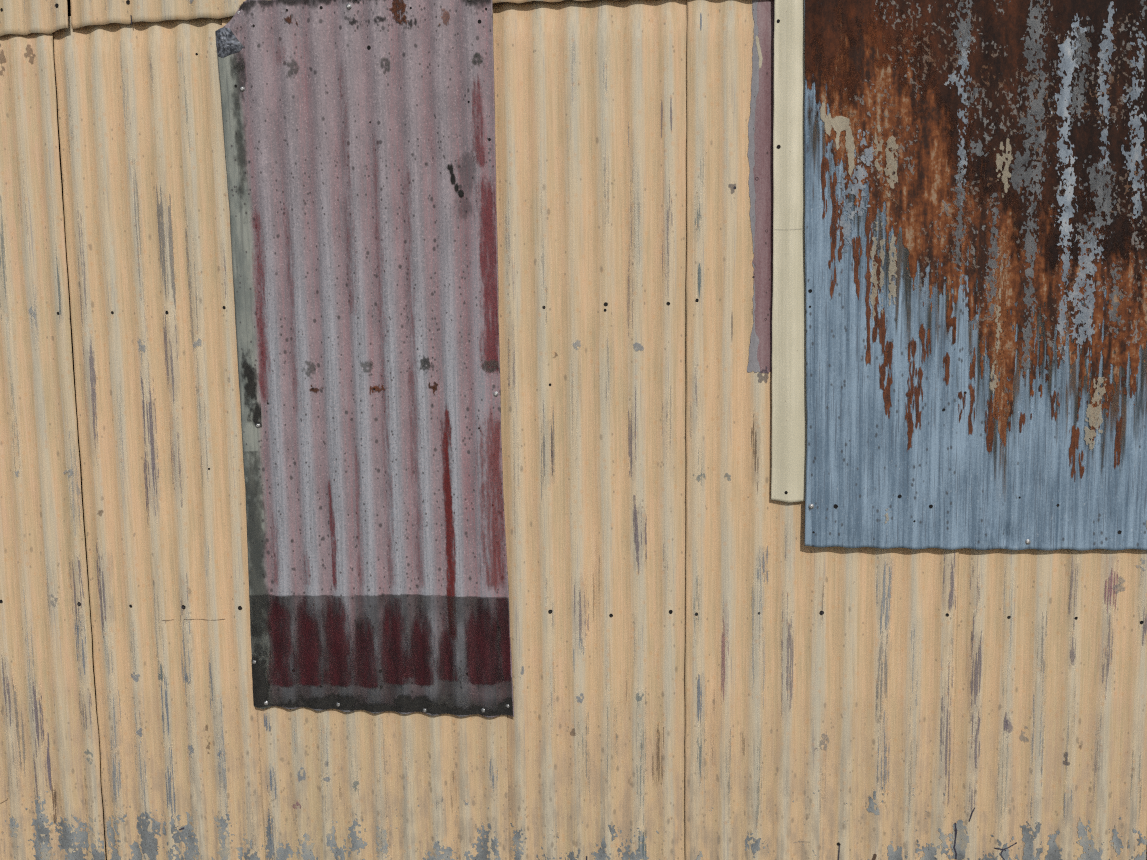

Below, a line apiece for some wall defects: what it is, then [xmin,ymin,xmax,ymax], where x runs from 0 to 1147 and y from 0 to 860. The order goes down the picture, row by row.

corrosion [805,0,1147,479]
peeling [2,662,13,726]
peeling [2,685,397,860]
peeling [745,833,769,858]
peeling [867,787,888,815]
peeling [940,675,953,803]
peeling [971,619,982,767]
peeling [887,817,1147,860]